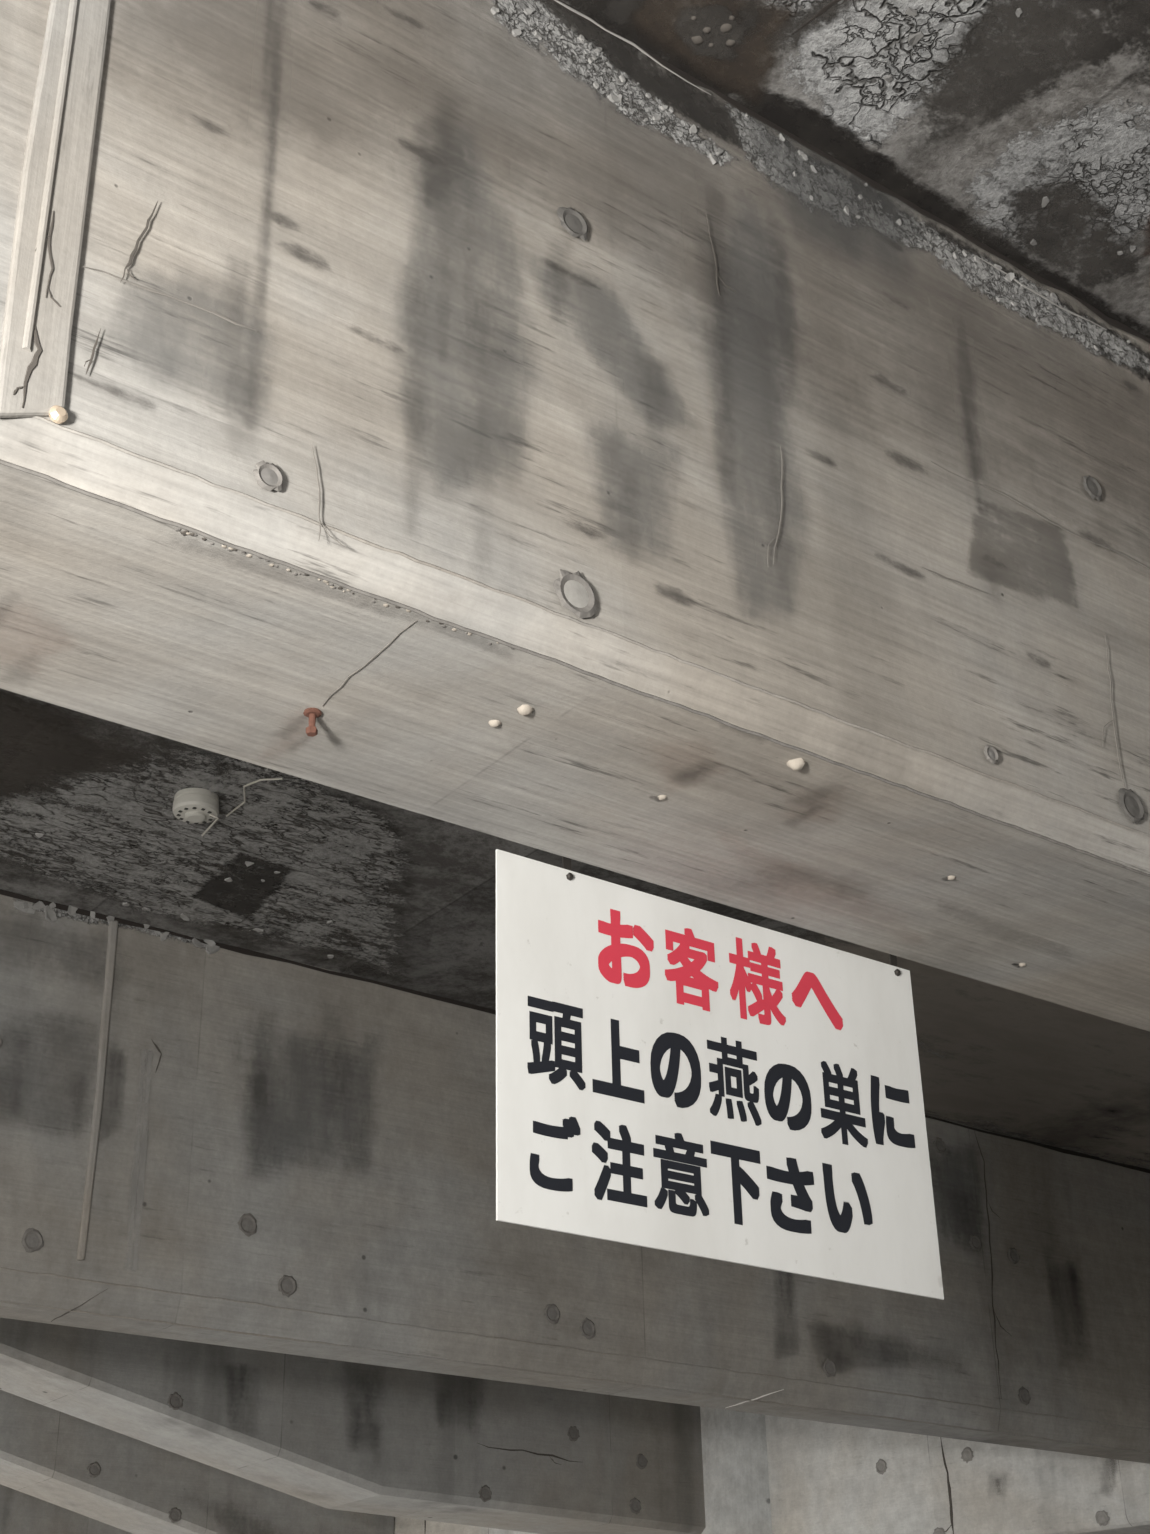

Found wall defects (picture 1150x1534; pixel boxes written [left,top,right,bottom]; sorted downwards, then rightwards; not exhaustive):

peeling [490,0,1150,373]
leakage [536,0,1150,382]
crack [551,0,1150,343]
leakage [0,689,409,979]
crack [0,889,496,1015]
crack [925,1115,1150,1392]
crack [940,1437,954,1534]